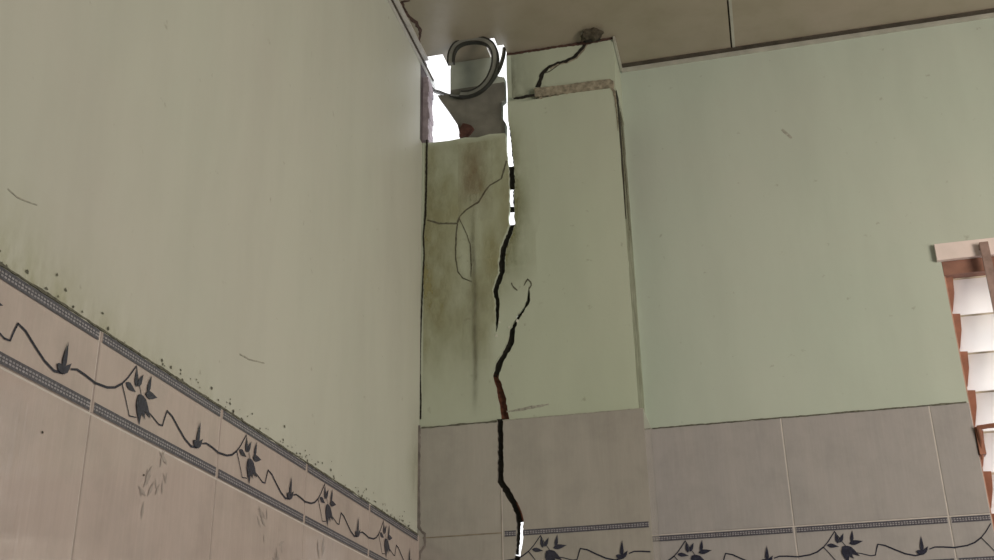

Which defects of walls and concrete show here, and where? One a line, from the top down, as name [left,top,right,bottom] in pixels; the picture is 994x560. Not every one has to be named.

crack [513,44,588,99]
damp [0,250,418,535]
crack [417,127,549,560]
damp [490,178,520,271]